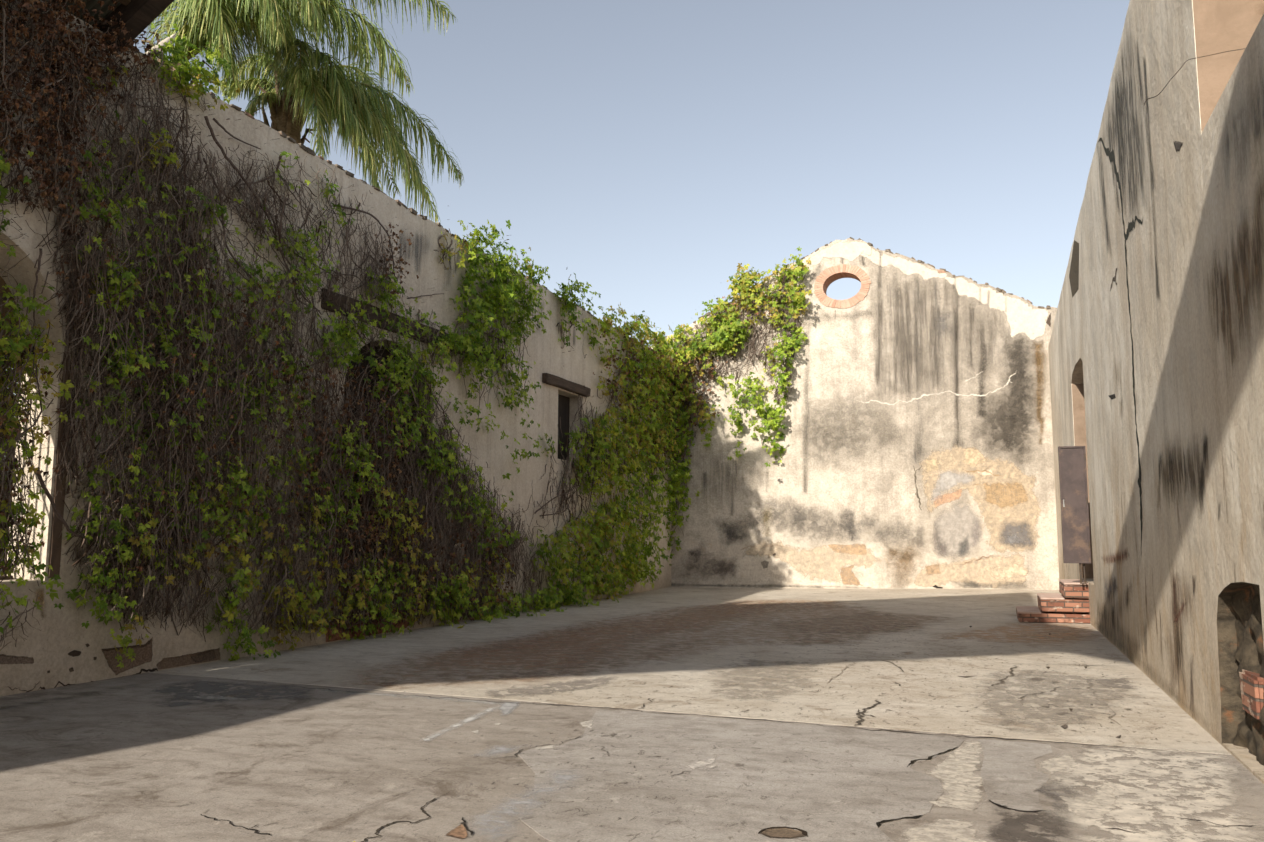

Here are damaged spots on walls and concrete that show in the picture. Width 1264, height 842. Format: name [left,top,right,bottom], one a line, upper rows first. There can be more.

damp [1099,51,1154,245]
damp [1212,198,1261,346]
crack [851,372,1016,405]
damp [894,290,1033,455]
peeling [746,541,881,585]
damp [724,504,915,576]
peeling [915,447,1041,588]
peeling [786,633,1260,842]
crack [361,792,473,842]
crack [758,826,807,836]
spalling [760,828,805,838]
crack [876,815,921,827]